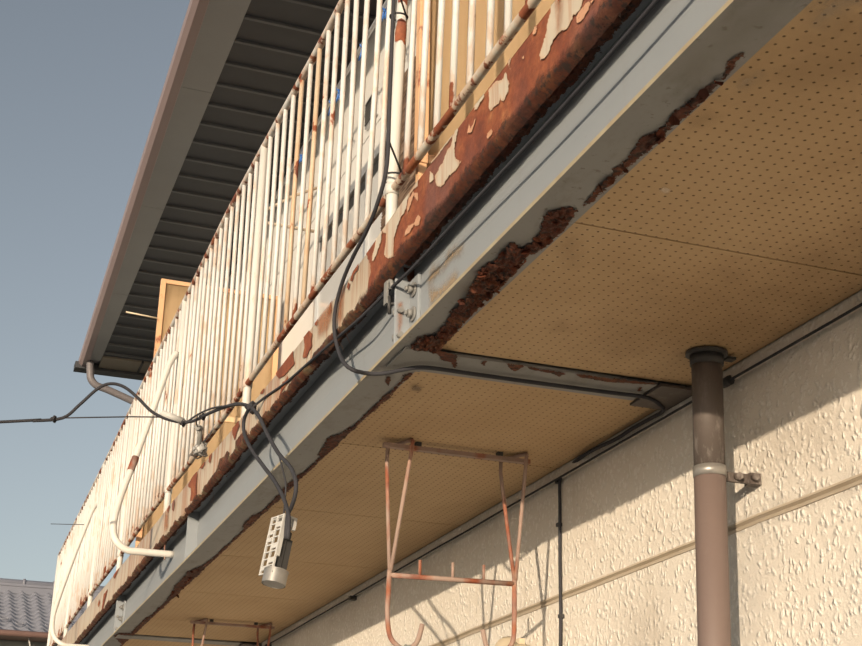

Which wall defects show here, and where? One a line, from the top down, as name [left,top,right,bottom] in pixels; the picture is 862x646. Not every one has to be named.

peeling [366,0,603,294]
corrosion [647,116,680,151]
corrosion [686,80,724,109]
corrosion [73,0,631,644]